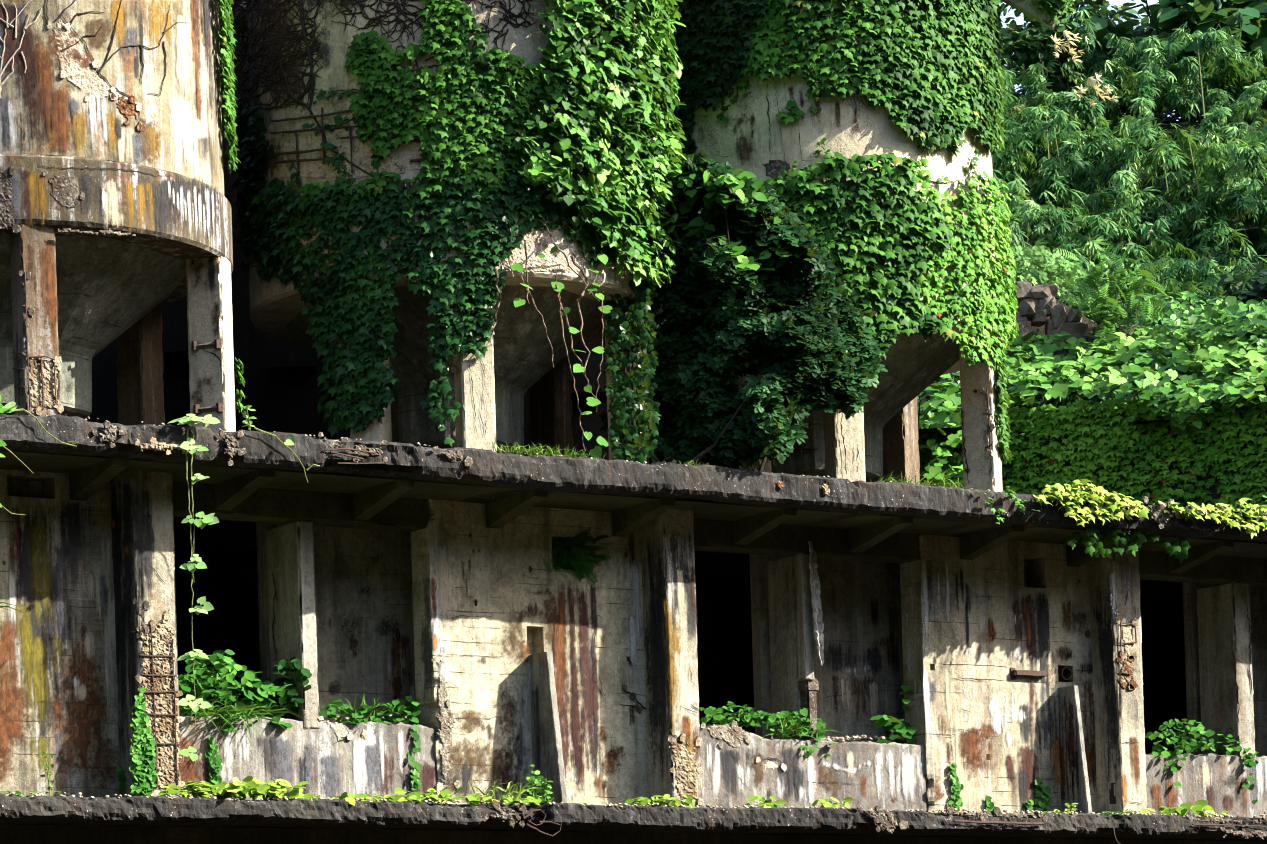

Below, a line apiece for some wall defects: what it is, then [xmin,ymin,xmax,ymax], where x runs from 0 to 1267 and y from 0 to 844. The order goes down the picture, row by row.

corrosion [0,4,92,154]
peeling [46,16,145,132]
corrosion [191,0,202,118]
spalling [12,270,64,416]
spalling [92,420,190,455]
corrosion [0,621,29,781]
damp [4,483,154,772]
spalling [131,598,185,796]
corrosion [503,584,626,796]
damp [629,529,753,795]
corrosion [939,646,1097,806]
spalling [1115,618,1139,690]